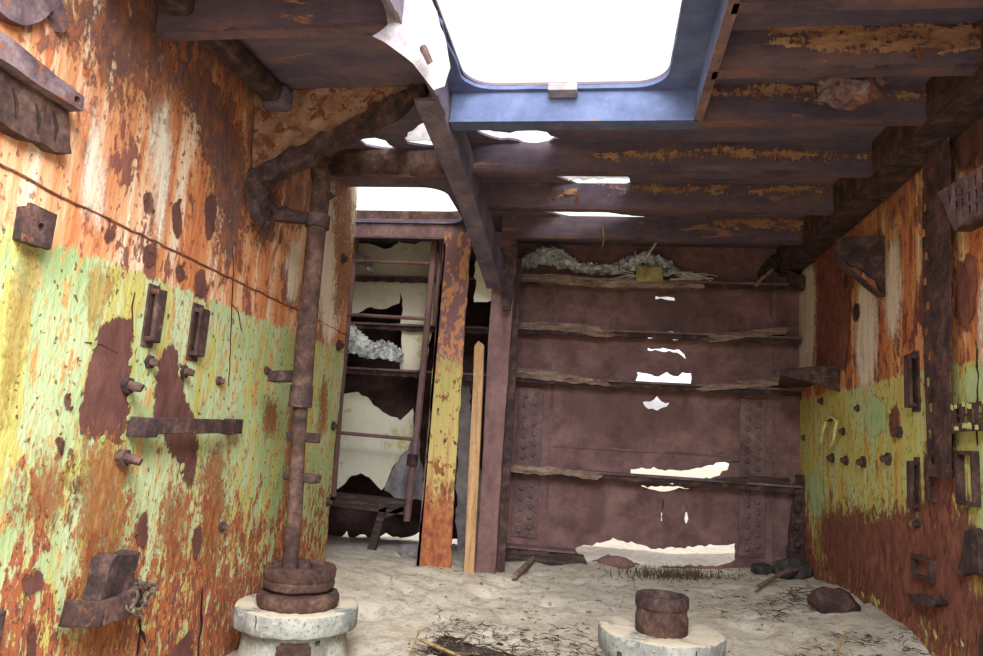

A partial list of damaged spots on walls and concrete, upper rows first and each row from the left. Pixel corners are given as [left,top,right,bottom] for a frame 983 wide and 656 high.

corrosion [49,0,279,298]
corrosion [0,250,39,434]
corrosion [84,258,120,330]
peeling [79,316,135,445]
corrosion [0,393,236,601]
peeling [153,344,195,419]
peeling [163,433,201,488]
corrosion [260,394,293,518]
corrosion [318,376,330,437]
corrosion [27,623,36,656]